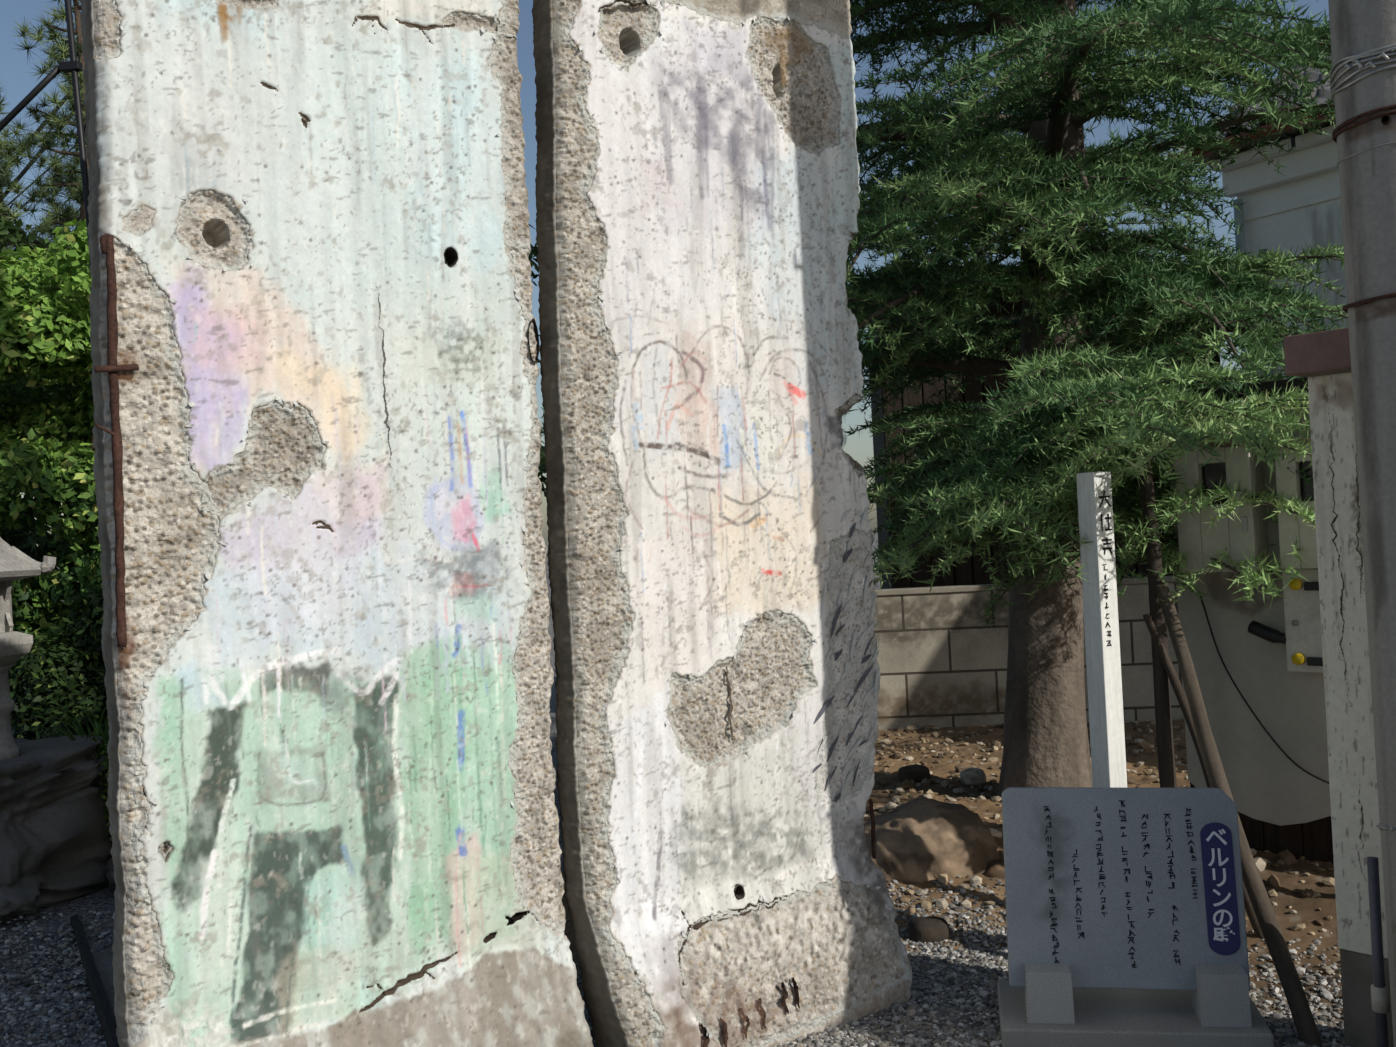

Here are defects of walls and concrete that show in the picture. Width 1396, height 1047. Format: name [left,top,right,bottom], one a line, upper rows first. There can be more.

spalling [215,0,277,10]
crack [352,15,455,45]
spalling [594,0,852,156]
spalling [172,190,254,271]
spalling [100,205,329,1044]
spalling [442,0,566,938]
spalling [552,0,666,1047]
spalling [665,506,879,807]
spalling [835,395,864,476]
crack [1328,402,1363,707]
crack [359,910,530,1013]
spalling [677,871,911,1047]